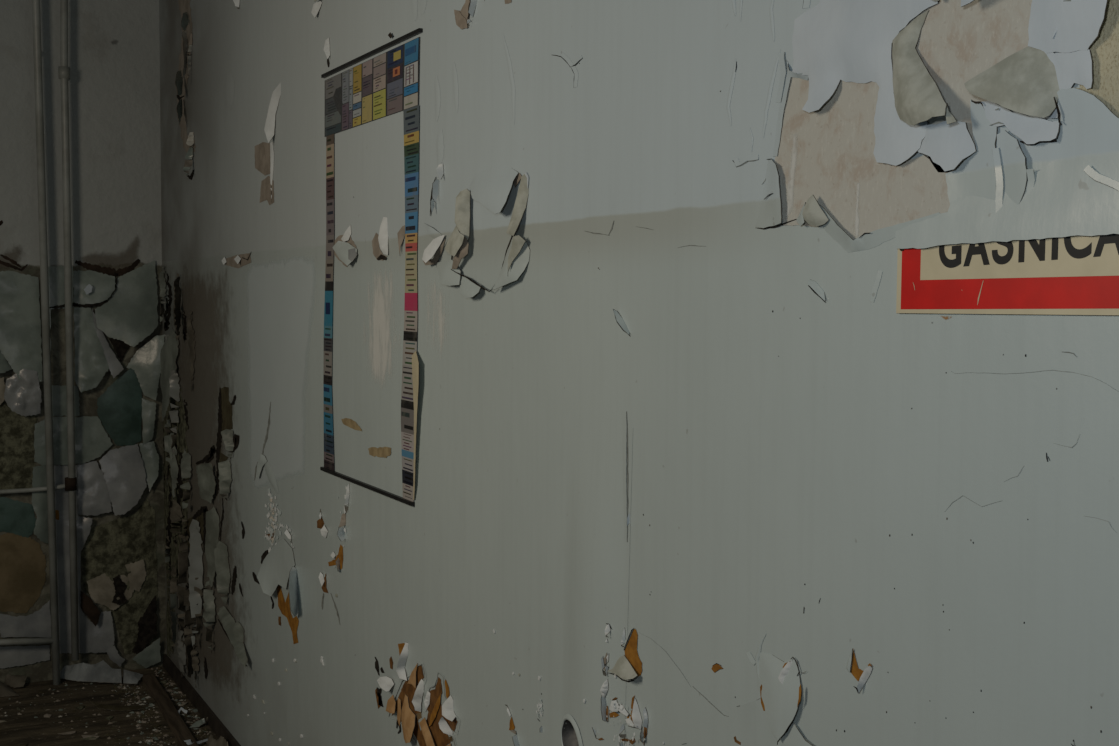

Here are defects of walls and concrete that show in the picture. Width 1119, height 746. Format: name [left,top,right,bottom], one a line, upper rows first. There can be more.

peeling [255,82,281,205]
peeling [756,0,1119,253]
peeling [422,130,530,298]
peeling [0,261,248,688]
leakage [177,280,232,562]
leakage [182,539,235,676]
peeling [252,488,299,644]
peeling [317,484,350,624]
peeling [375,642,460,746]
peeling [560,623,648,746]
crack [642,633,814,746]
peeling [846,648,873,693]